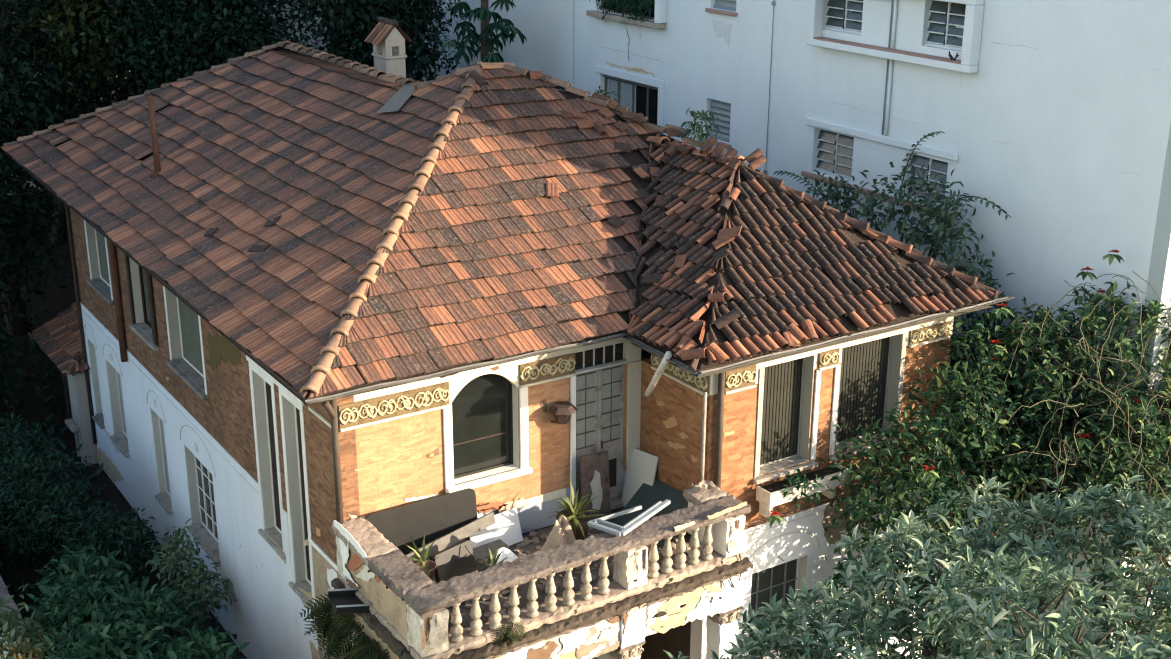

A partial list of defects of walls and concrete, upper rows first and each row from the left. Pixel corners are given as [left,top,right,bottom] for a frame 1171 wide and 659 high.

peeling [327,520,395,595]
spalling [646,583,733,633]
peeling [495,626,621,659]